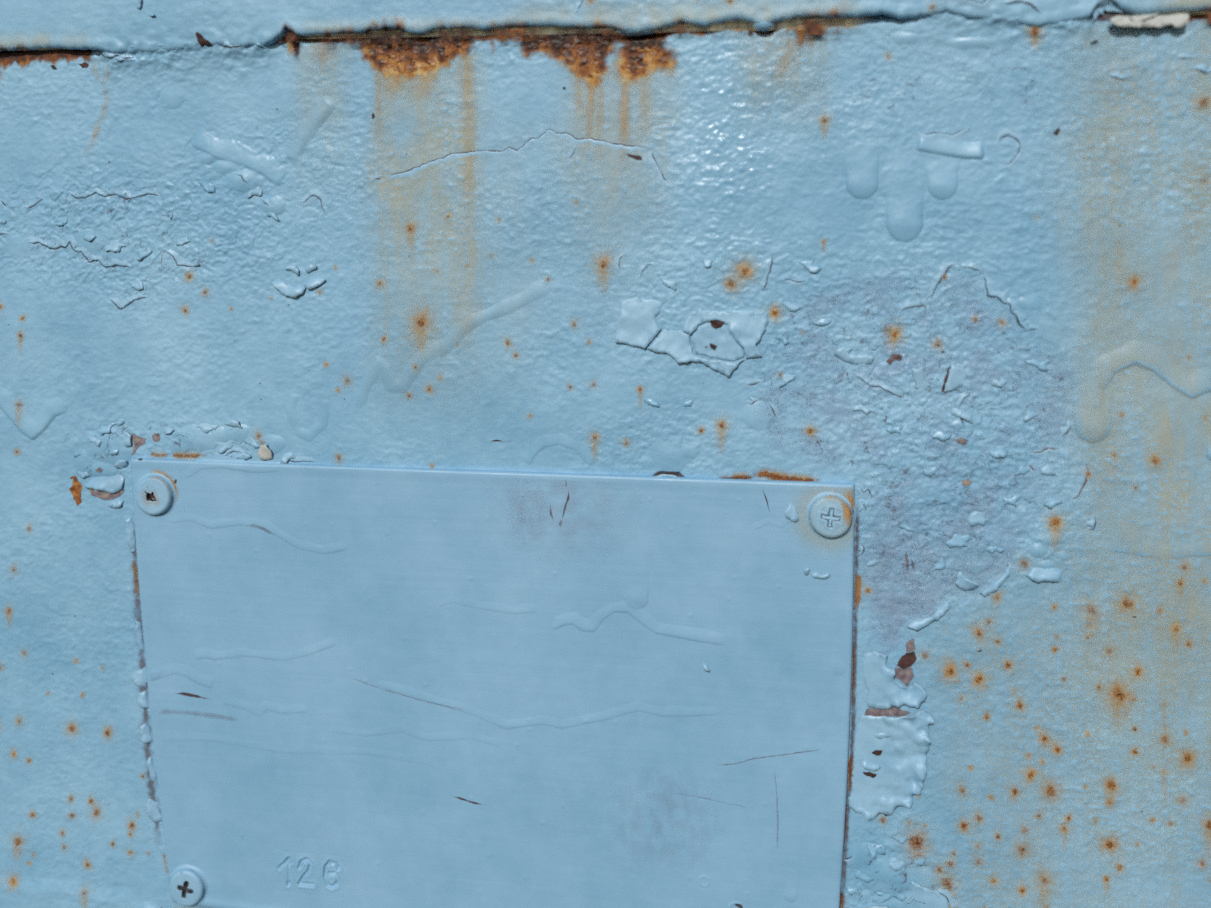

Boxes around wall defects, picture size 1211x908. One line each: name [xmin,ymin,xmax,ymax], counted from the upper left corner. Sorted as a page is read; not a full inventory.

rust [0,46,91,68]
rust [279,11,855,135]
crack [372,129,670,185]
peeling [271,263,325,298]
peeling [615,297,789,377]
peeling [834,342,967,393]
peeling [196,419,296,464]
peeling [70,418,183,553]
peeling [848,501,1012,821]
rust [944,663,985,687]
rust [1109,684,1129,704]
rust [1026,754,1056,796]